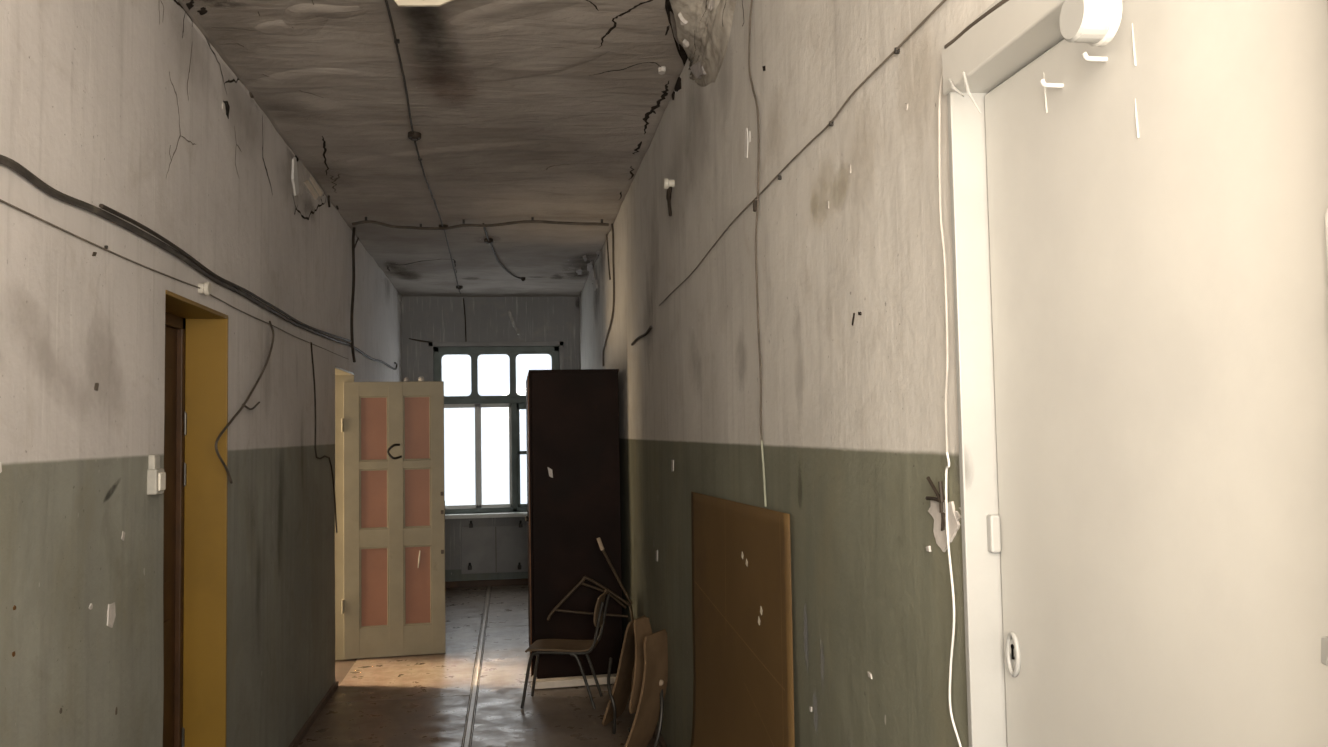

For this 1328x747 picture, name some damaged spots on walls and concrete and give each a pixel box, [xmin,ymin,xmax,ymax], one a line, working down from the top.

crack [586,0,744,200]
spalling [925,477,961,552]